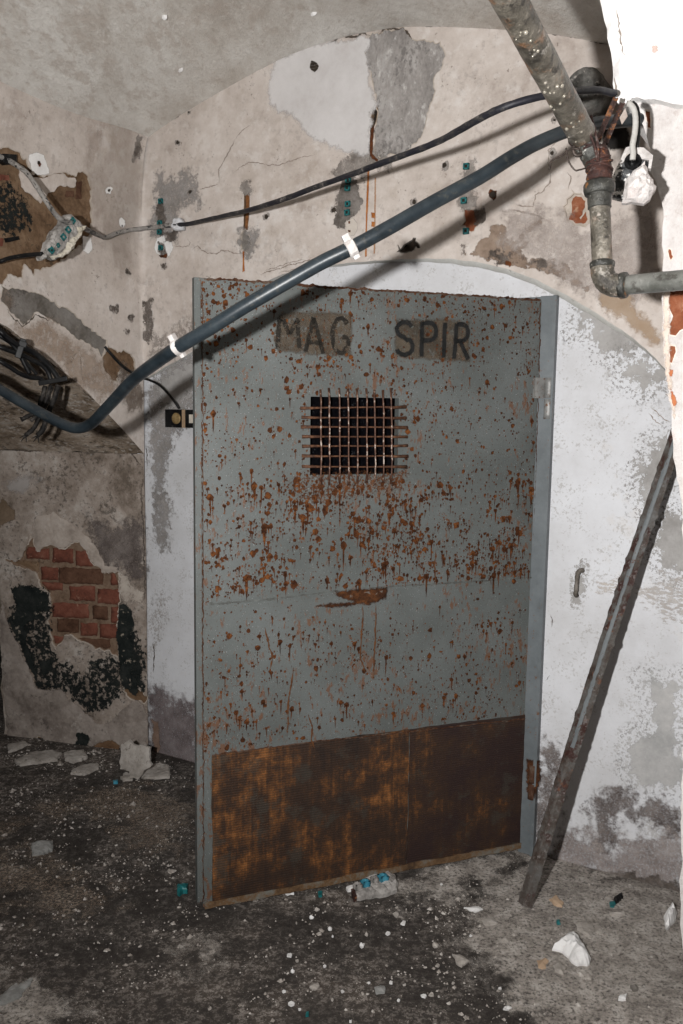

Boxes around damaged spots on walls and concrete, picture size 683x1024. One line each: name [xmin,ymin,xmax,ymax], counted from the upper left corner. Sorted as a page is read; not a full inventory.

flaking render [365,27,446,158]
crack [202,125,313,189]
corrosion [366,126,378,231]
flaking render [0,146,136,383]
crack [173,244,240,255]
corrosion [200,251,273,324]
water stain [499,203,662,344]
flaking render [0,512,172,776]
corrosion [195,283,541,902]
water stain [536,742,562,838]
water stain [547,786,682,893]